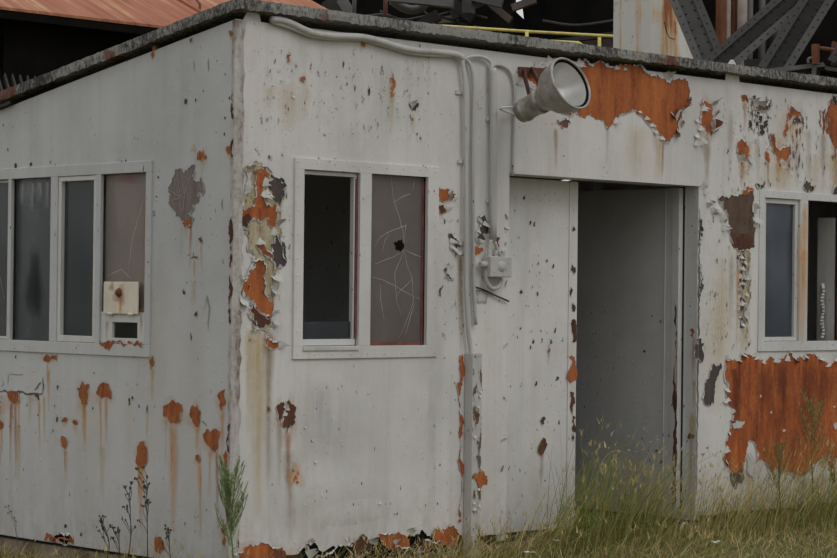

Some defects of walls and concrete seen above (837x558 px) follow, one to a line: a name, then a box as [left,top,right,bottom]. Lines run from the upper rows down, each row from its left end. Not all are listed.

rust [737,139,756,165]
rust [742,95,808,170]
rust [819,99,837,150]
peeling [167,164,205,237]
peeling [698,95,837,350]
peeling [240,147,293,374]
peeling [694,308,722,407]
rust [0,391,19,441]
rust [61,382,112,427]
rust [723,350,837,489]
rust [135,441,147,490]
peeling [305,535,356,558]